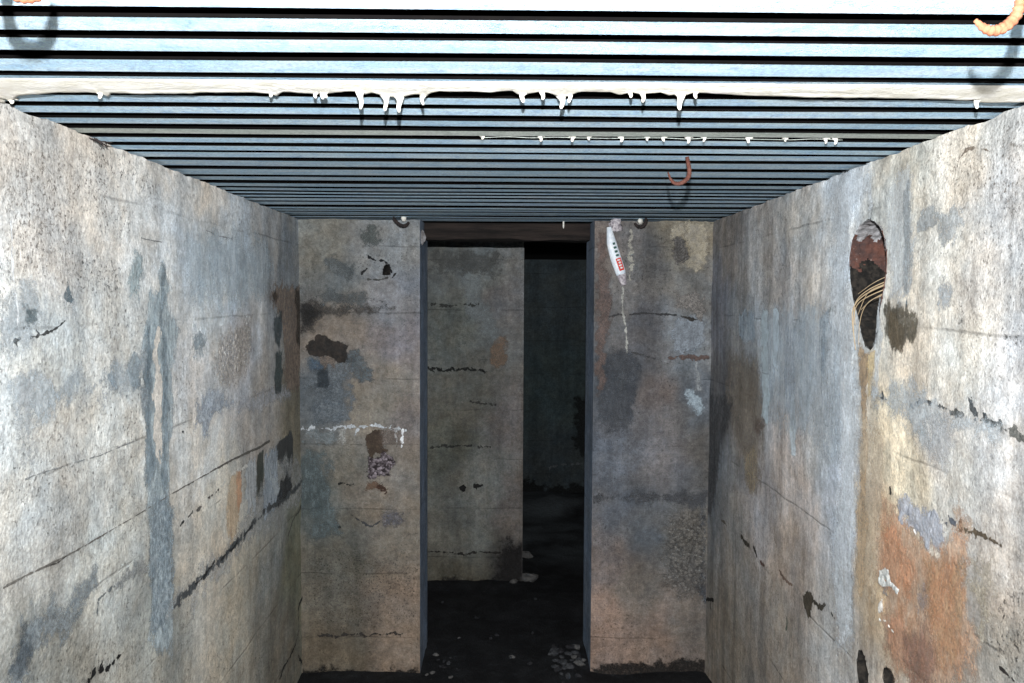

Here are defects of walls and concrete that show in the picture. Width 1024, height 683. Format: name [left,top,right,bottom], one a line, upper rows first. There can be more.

leakage [0,78,1024,113]
leakage [0,221,46,359]
crack [13,321,65,347]
leakage [871,167,1003,470]
crack [3,440,270,589]
leakage [7,249,407,657]
crack [174,480,341,608]
spalling [366,451,396,479]
leakage [738,168,872,647]
rust [855,342,981,683]
crack [911,397,1024,442]
crack [280,596,303,678]